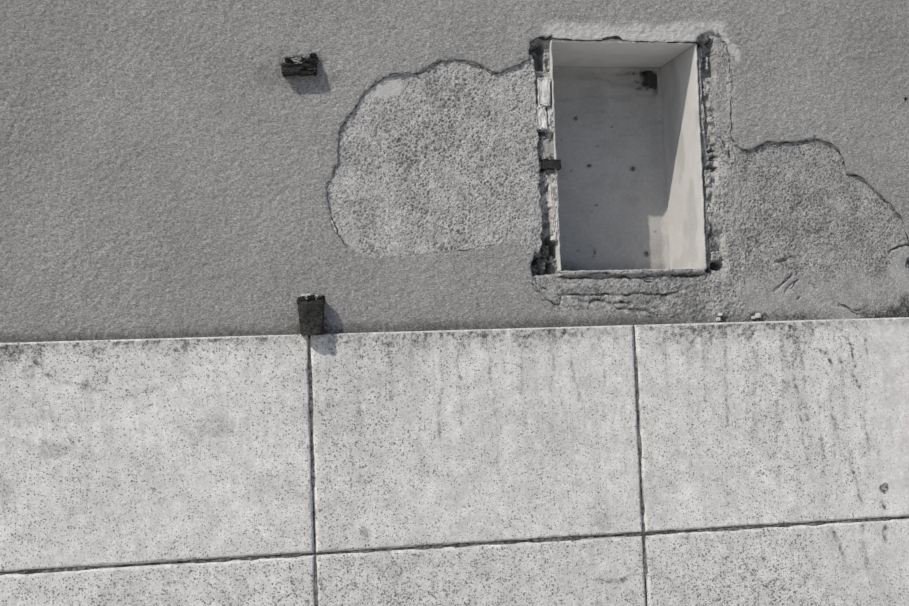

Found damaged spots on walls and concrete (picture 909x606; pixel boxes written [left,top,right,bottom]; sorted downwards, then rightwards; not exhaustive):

flaking render [326,55,543,259]
flaking render [714,34,909,322]